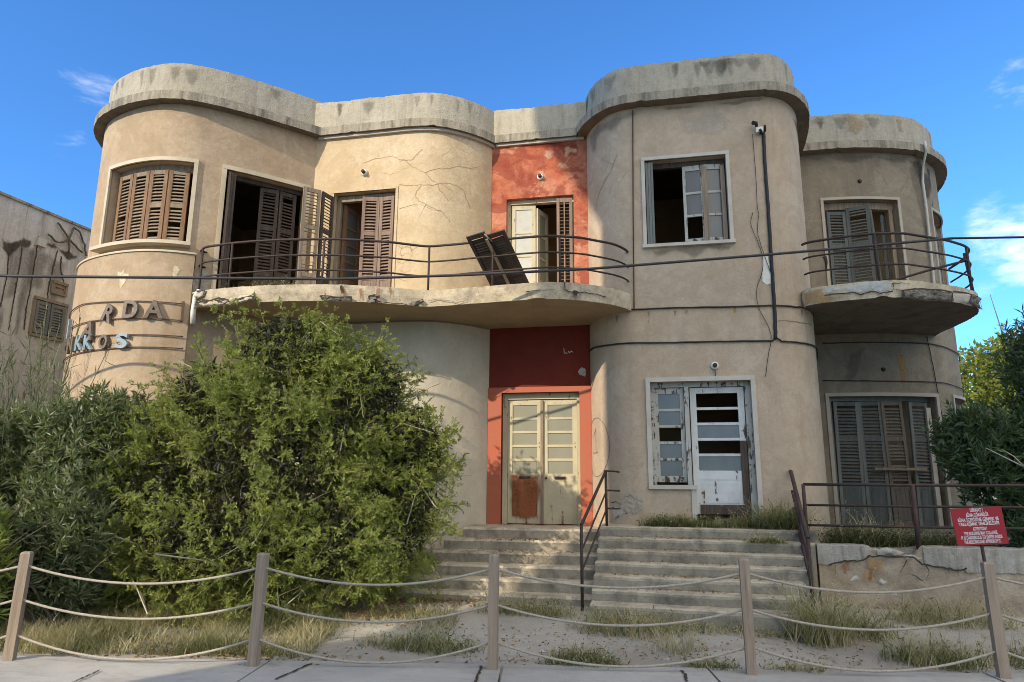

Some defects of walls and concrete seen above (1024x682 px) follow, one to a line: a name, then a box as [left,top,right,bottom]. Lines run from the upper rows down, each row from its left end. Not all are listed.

crack [364,148,479,305]
spalling [192,270,259,308]
spalling [902,288,954,302]
spalling [968,294,982,309]
crack [829,555,967,581]